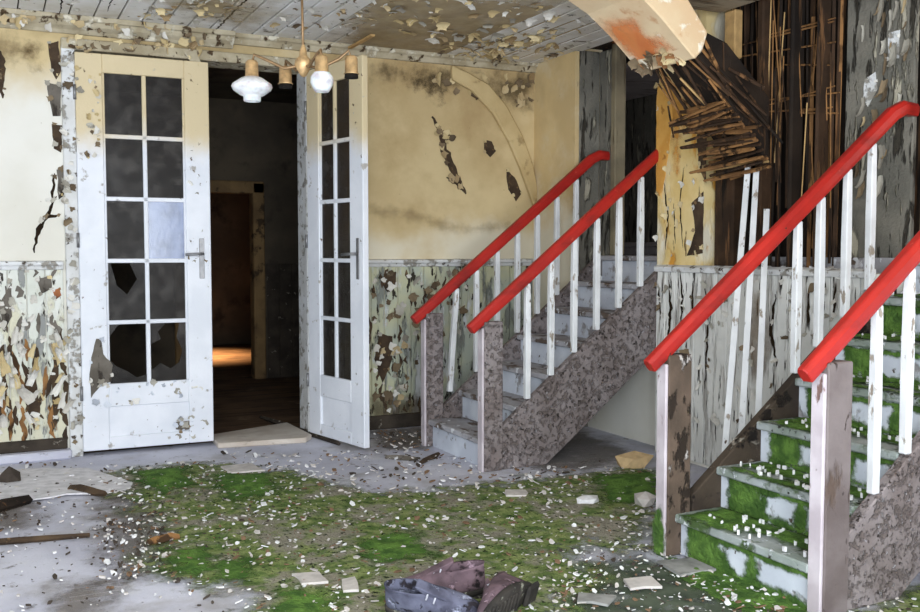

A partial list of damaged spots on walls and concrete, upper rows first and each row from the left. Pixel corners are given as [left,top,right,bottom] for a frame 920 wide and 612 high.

peeling [44,0,233,159]
peeling [270,0,586,108]
peeling [855,0,910,127]
crack [33,173,61,253]
peeling [57,161,78,232]
peeling [483,138,496,157]
peeling [506,167,523,201]
peeling [854,145,887,199]
peeling [0,260,119,445]
peeling [129,379,203,406]
peeling [172,415,209,439]
peeling [370,268,458,413]